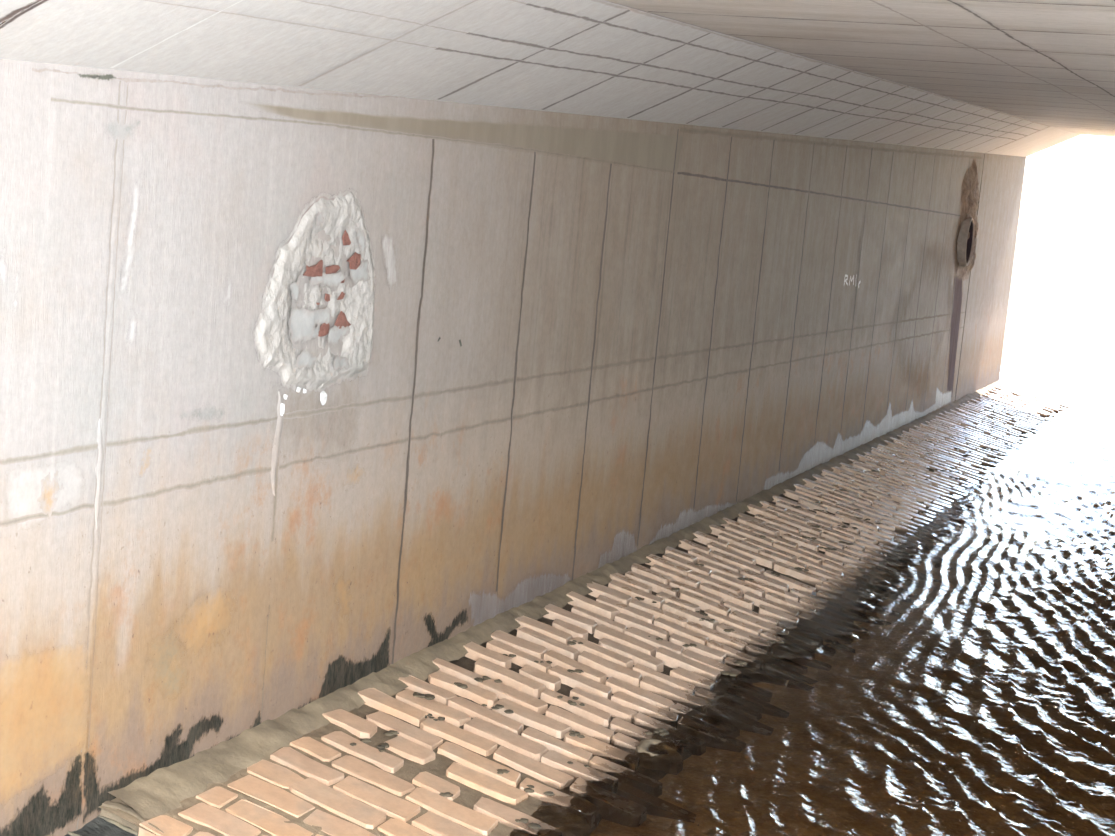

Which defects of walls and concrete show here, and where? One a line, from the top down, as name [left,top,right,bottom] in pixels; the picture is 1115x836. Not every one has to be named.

crack [0,0,49,29]
crack [32,68,406,99]
spalling [252,188,376,416]
water stain [597,499,744,569]
water stain [467,570,572,627]